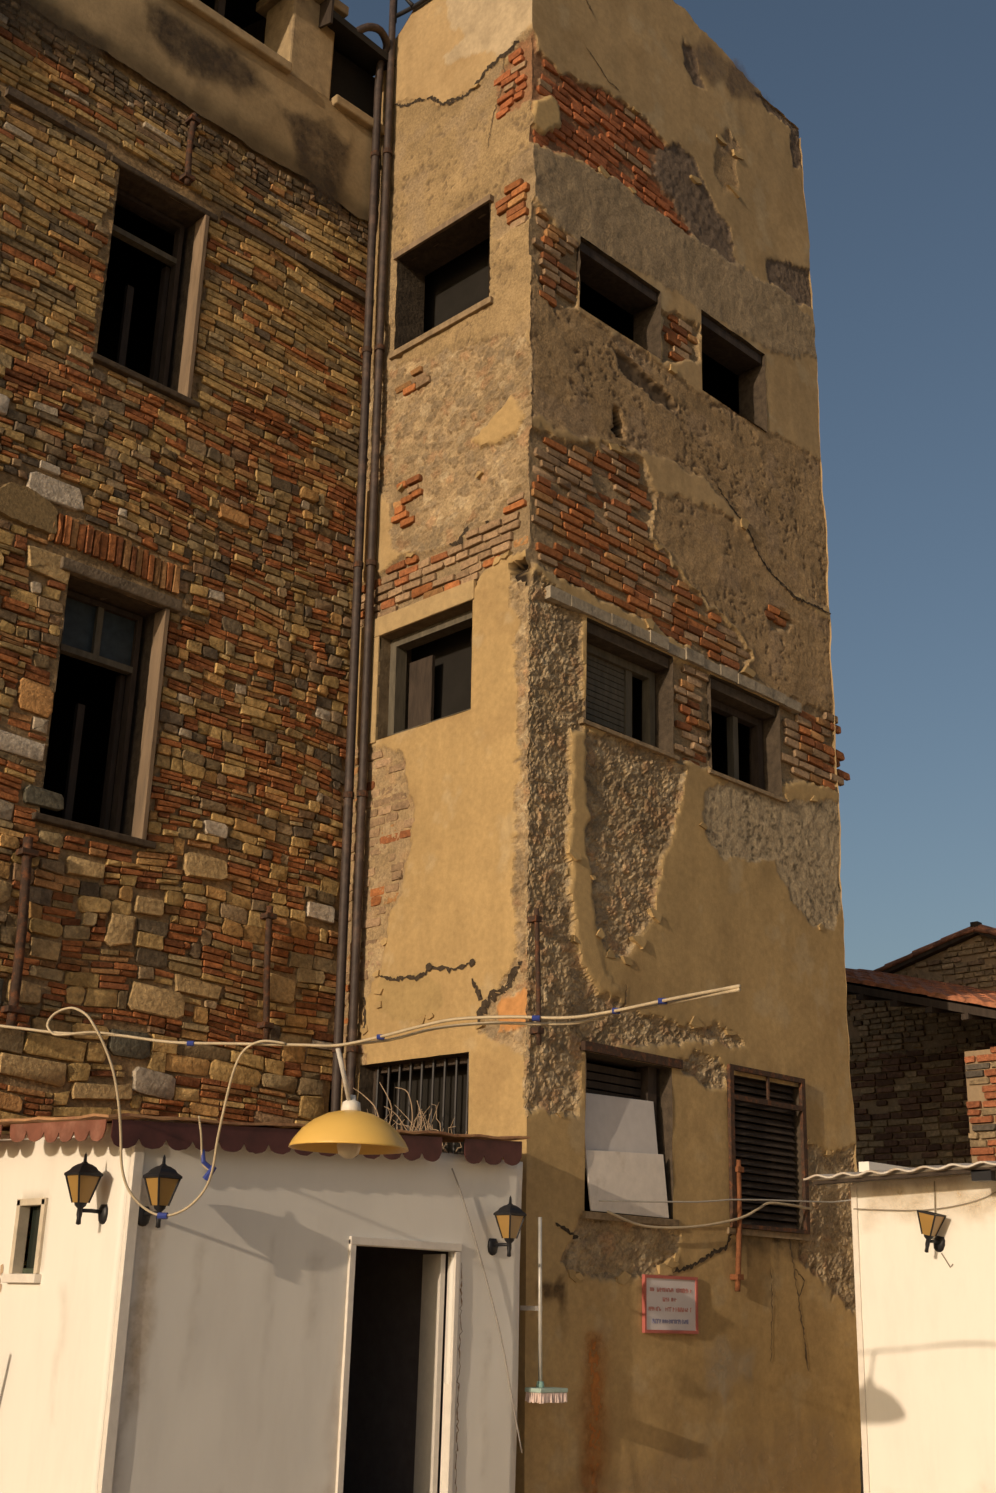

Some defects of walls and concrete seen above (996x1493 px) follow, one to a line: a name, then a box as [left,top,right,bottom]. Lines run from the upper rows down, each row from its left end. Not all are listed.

leakage [153,9,258,86]
spalling [360,0,850,1118]
spalling [330,744,443,1089]
crack [362,959,522,1036]
spalling [964,1046,996,1162]
spalling [560,1214,682,1285]
spalling [798,1137,856,1312]